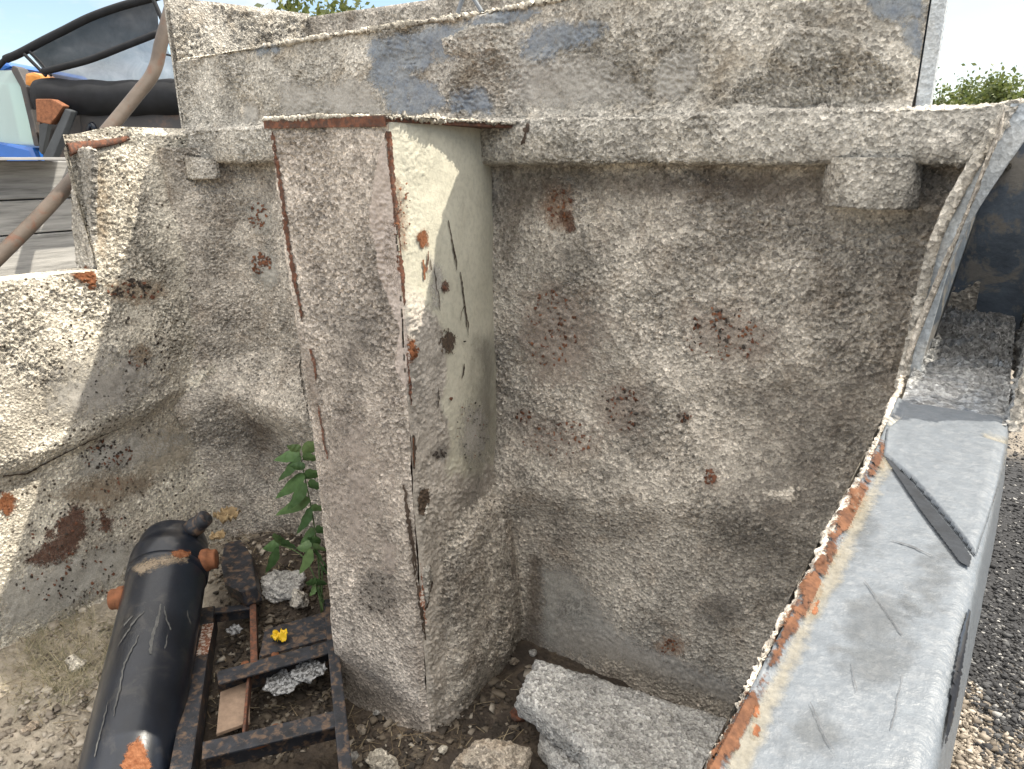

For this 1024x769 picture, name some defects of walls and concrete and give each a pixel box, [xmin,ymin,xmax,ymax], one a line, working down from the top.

corrosion [72,266,98,290]
corrosion [247,132,303,322]
corrosion [384,131,429,306]
corrosion [542,185,576,233]
corrosion [0,491,18,521]
corrosion [25,471,153,569]
crack [402,435,433,640]
corrosion [703,439,888,769]